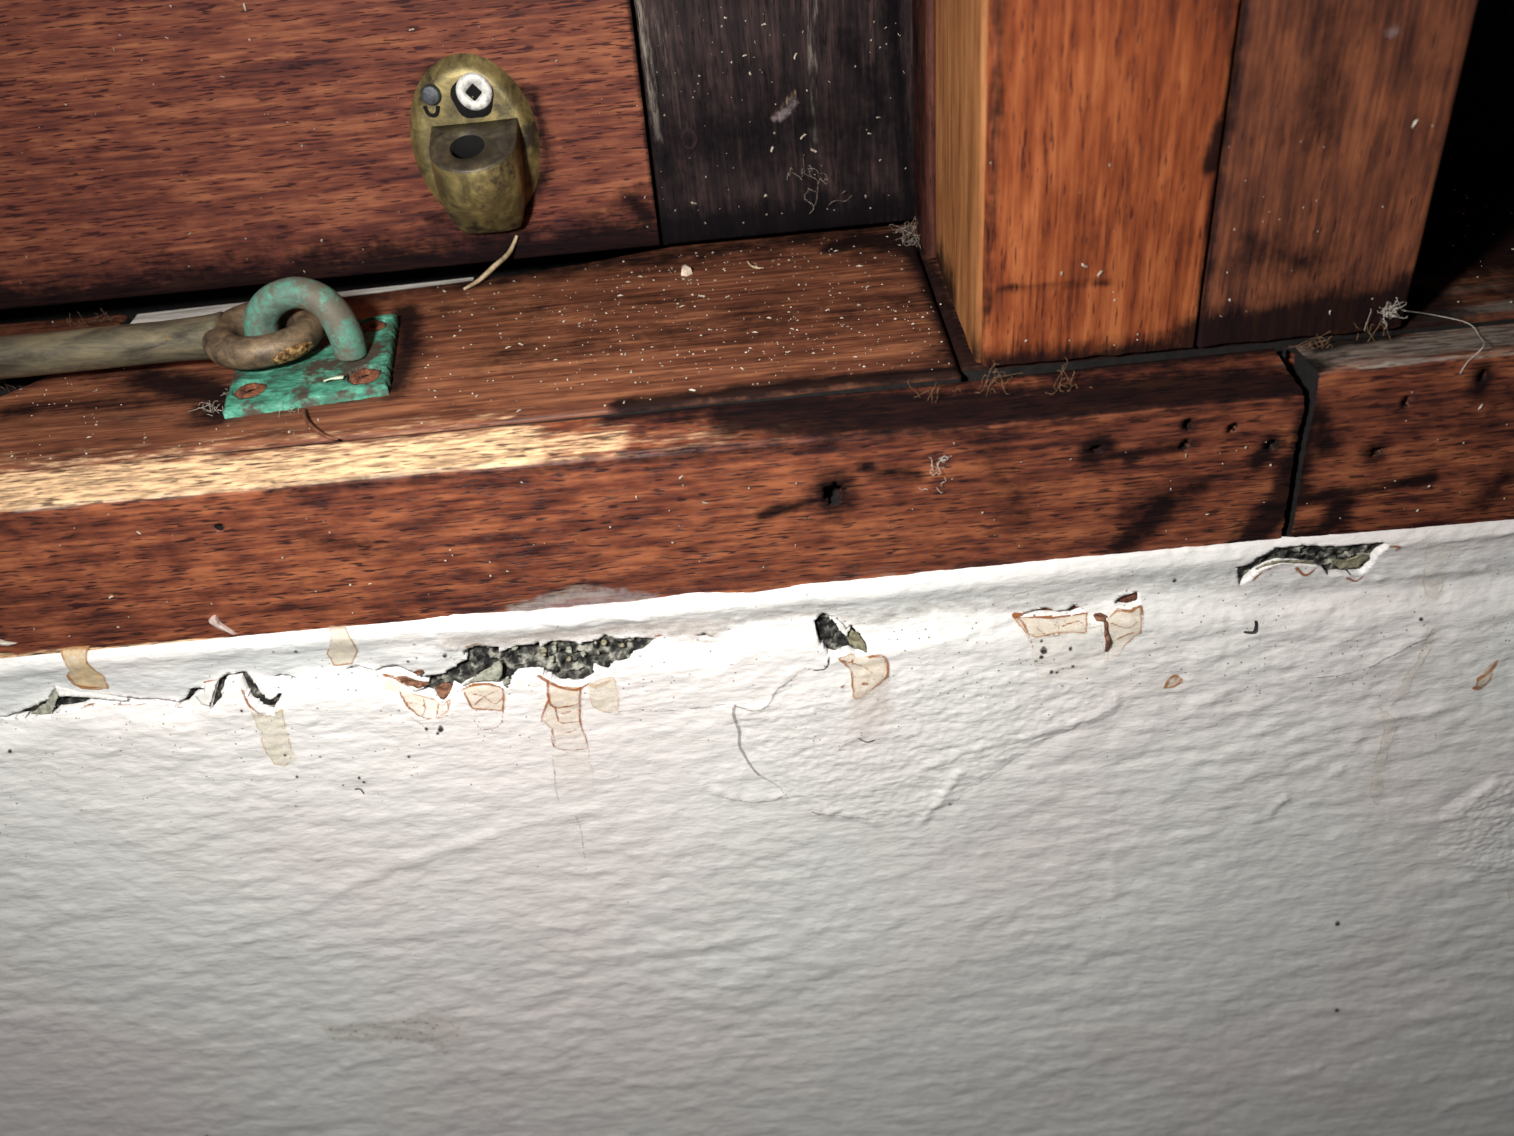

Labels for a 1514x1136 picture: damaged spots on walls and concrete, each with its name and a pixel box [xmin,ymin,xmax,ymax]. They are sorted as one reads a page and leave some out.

spalling [1237,542,1400,582]
spalling [815,613,867,653]
spalling [1012,592,1138,652]
spalling [383,634,661,699]
spalling [22,685,145,715]
spalling [166,671,282,714]
crack [668,658,858,818]